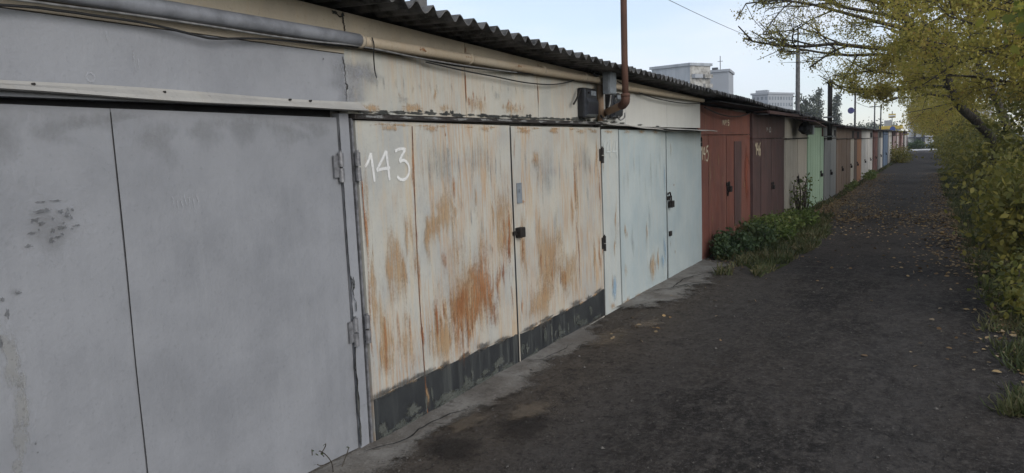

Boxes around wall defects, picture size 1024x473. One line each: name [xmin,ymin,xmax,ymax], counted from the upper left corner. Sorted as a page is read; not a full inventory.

peeling [25,200,81,247]
corrosion [362,182,580,369]